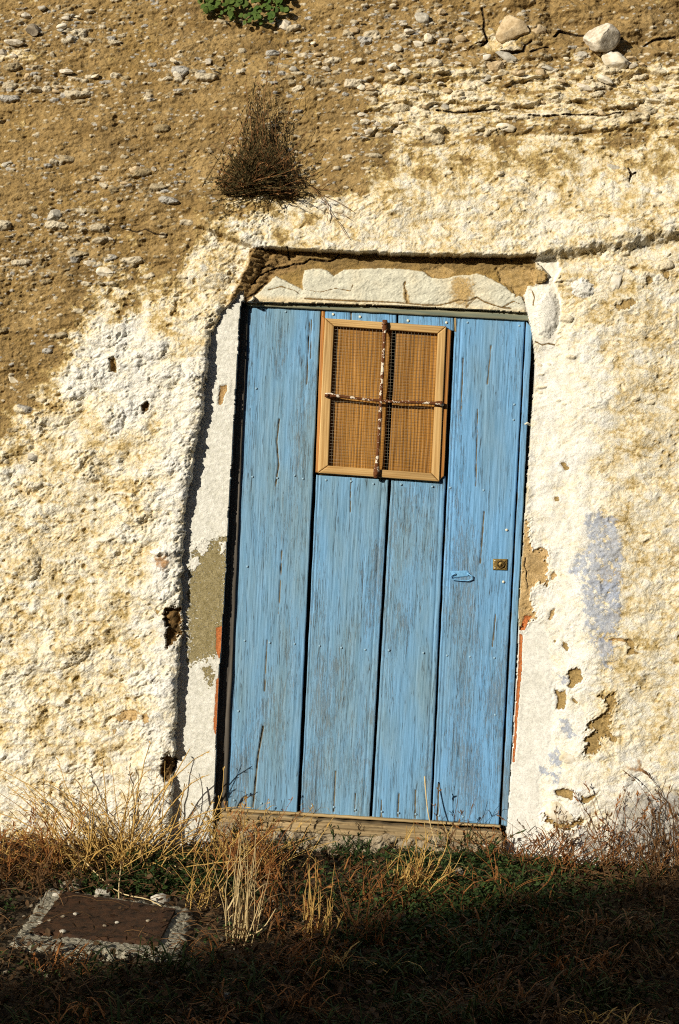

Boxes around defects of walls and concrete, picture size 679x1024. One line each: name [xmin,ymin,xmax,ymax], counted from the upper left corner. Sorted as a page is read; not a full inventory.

peeling [156,535,227,734]
spalling [512,520,557,762]
spalling [555,667,583,709]
spalling [582,692,617,755]
spalling [544,813,585,830]
spalling [555,789,597,803]